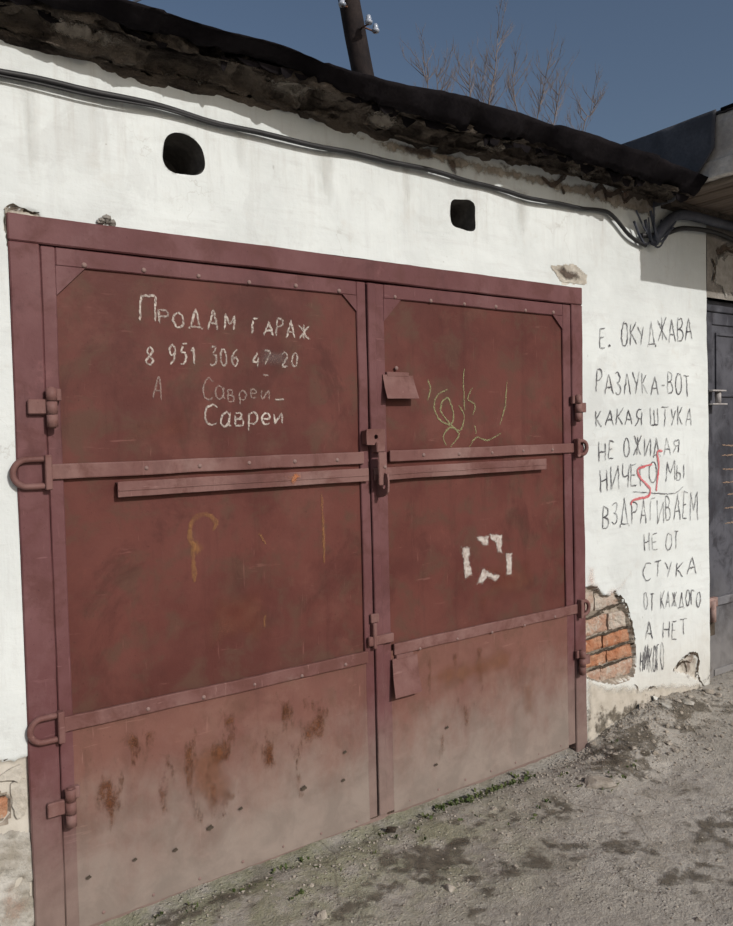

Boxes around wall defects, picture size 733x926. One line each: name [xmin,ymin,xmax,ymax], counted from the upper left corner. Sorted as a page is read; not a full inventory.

spalling [53,20,108,45]
flaking render [551,264,587,285]
flaking render [712,244,733,296]
flaking render [585,586,636,685]
flaking render [676,652,705,686]
flaking render [0,764,35,926]